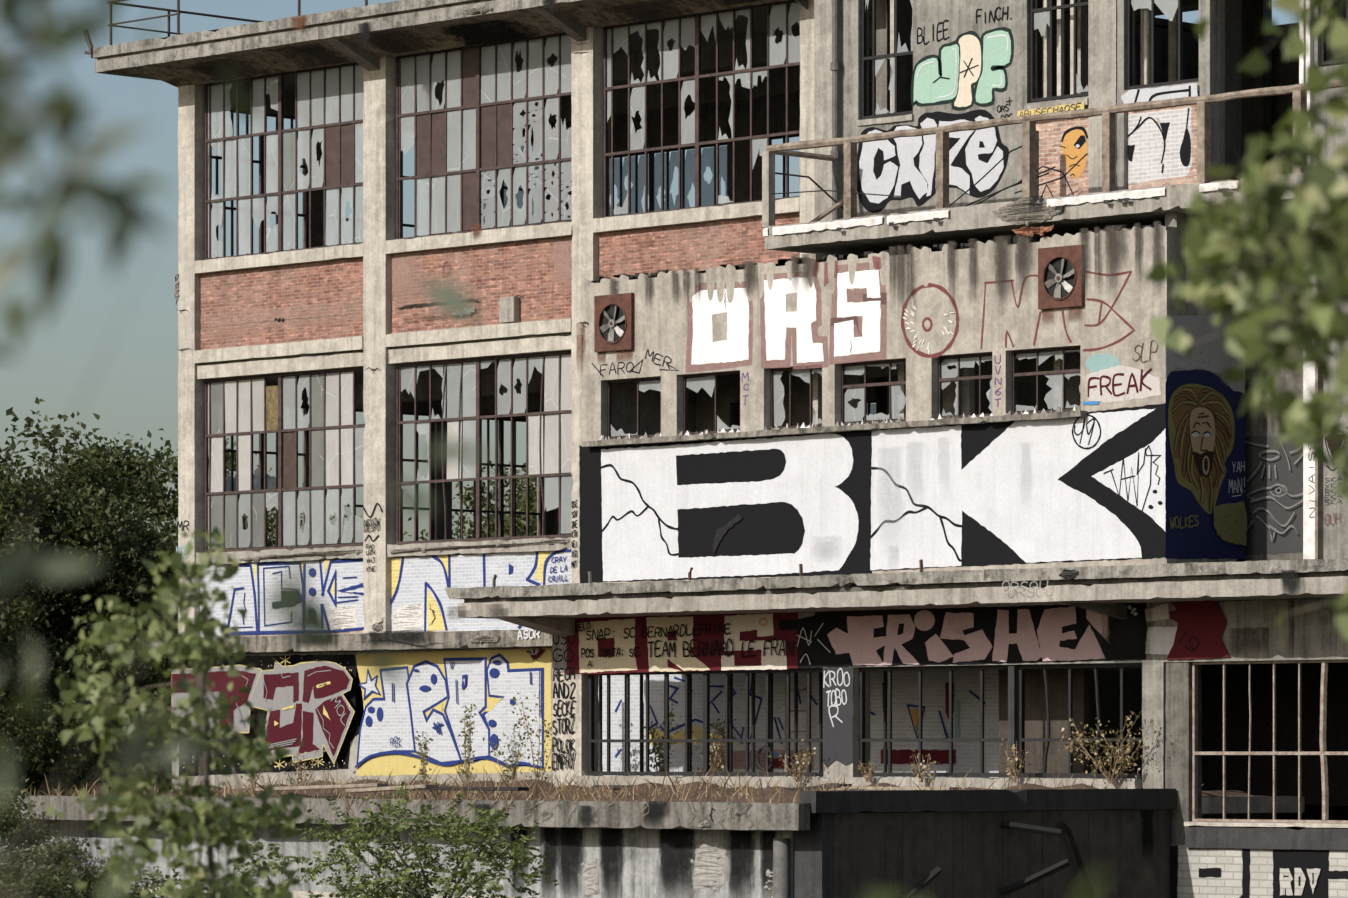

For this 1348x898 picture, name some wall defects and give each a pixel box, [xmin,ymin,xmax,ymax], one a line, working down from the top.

water stain [671,268,700,294]
water stain [744,261,756,286]
water stain [791,254,815,279]
water stain [889,245,913,291]
water stain [472,804,491,822]
water stain [510,806,622,887]
water stain [643,801,695,887]
water stain [727,831,776,888]